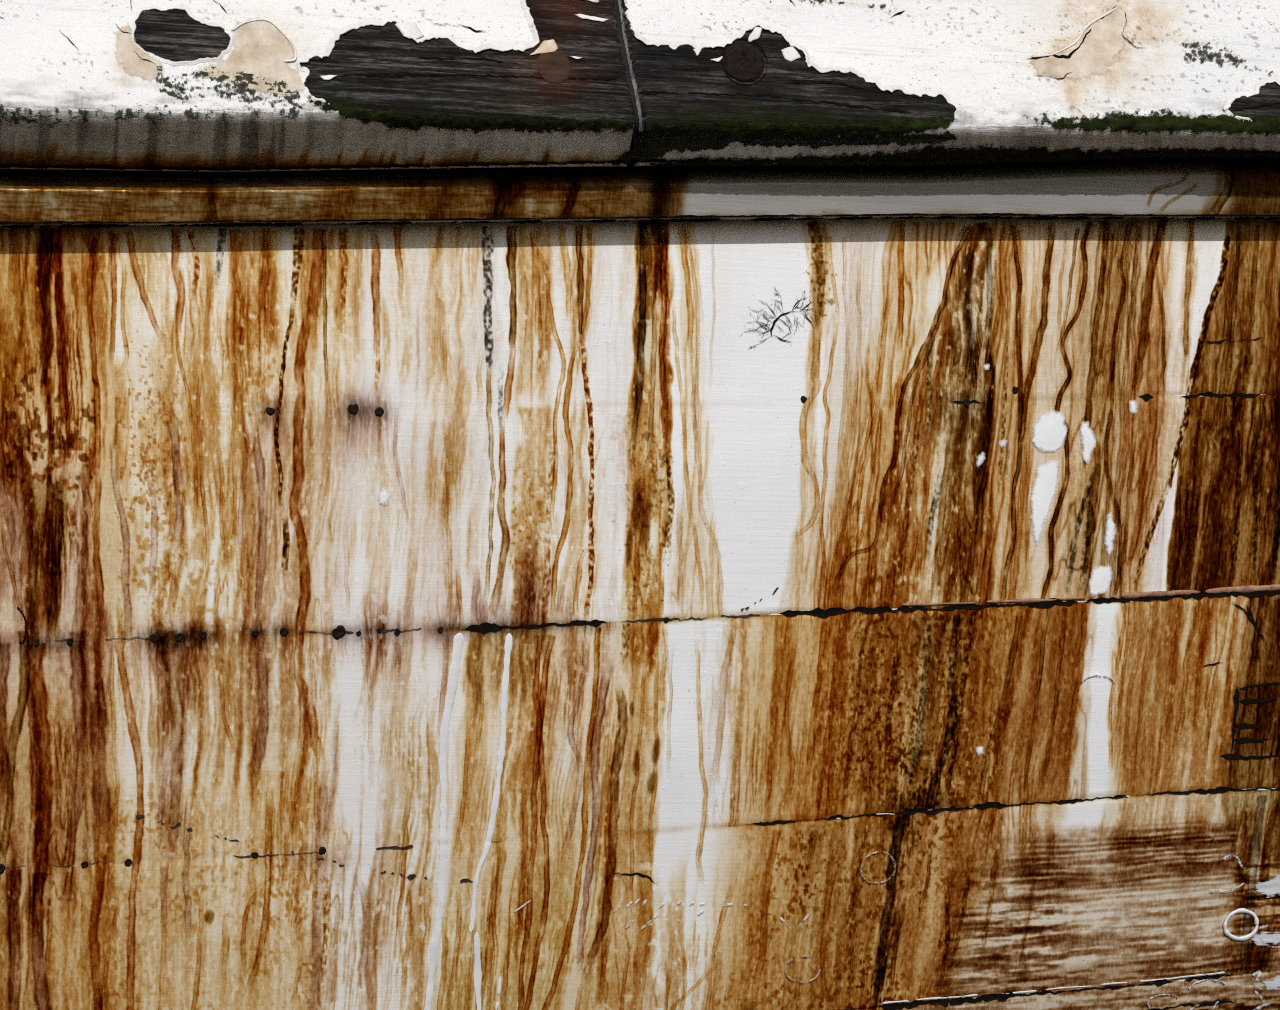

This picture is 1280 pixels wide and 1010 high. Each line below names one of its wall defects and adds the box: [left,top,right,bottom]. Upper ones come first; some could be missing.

peeling [115,0,960,136]
crack [1027,6,1144,79]
water stain [1021,108,1221,128]
peeling [1223,77,1280,124]
corrosion [0,111,688,1010]
corrosion [711,163,1280,1010]